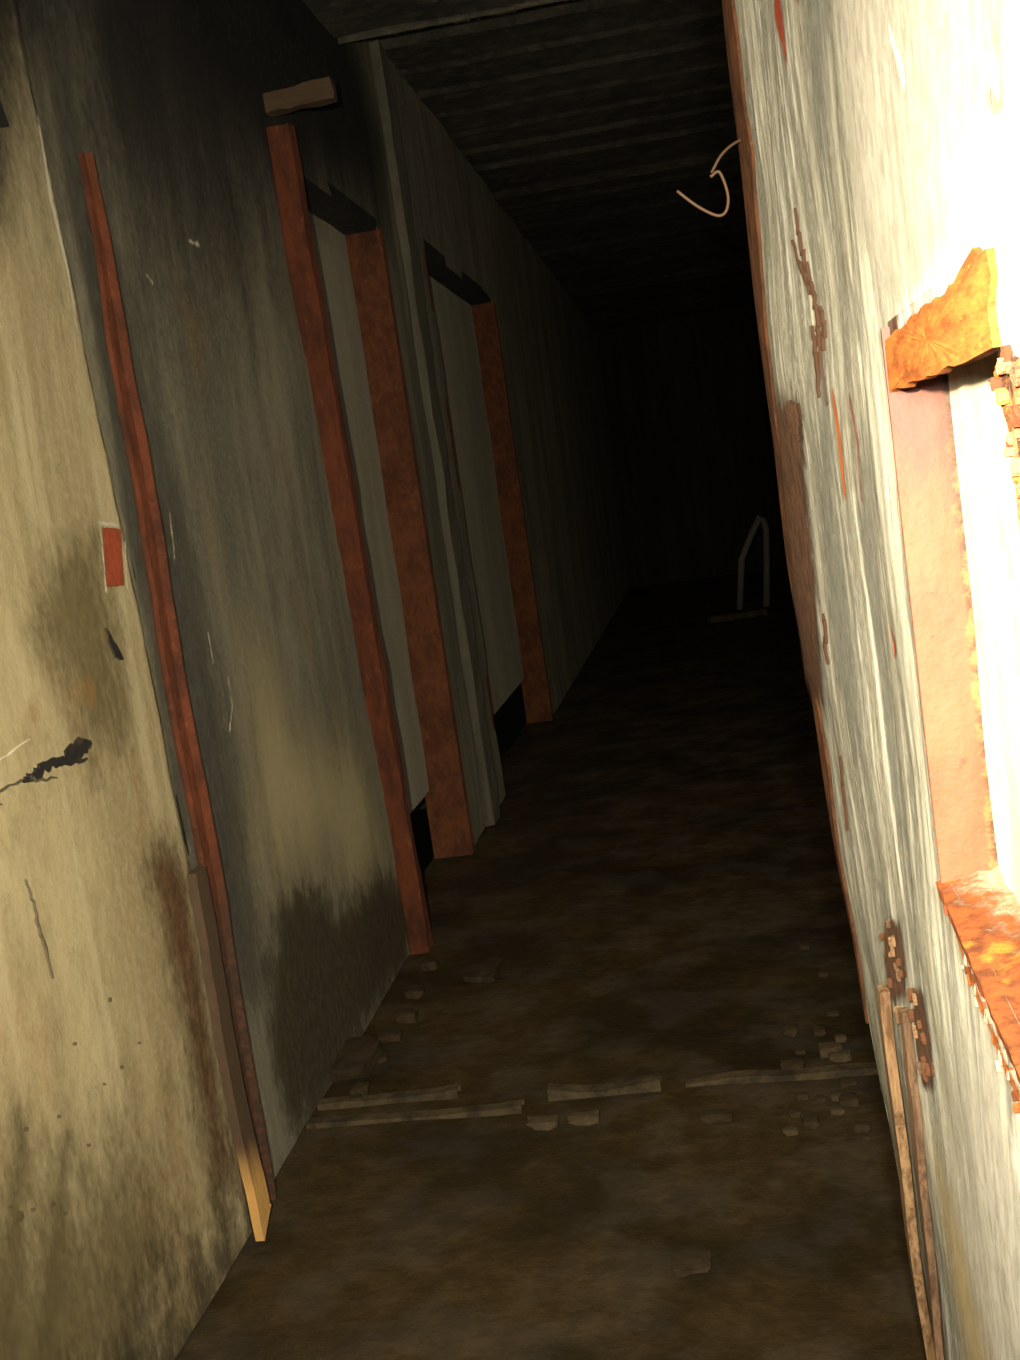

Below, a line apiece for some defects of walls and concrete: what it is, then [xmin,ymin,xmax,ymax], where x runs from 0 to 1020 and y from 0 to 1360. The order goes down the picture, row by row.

corrosion [988,344,1020,498]
water stain [40,554,122,736]
crack [0,736,92,805]